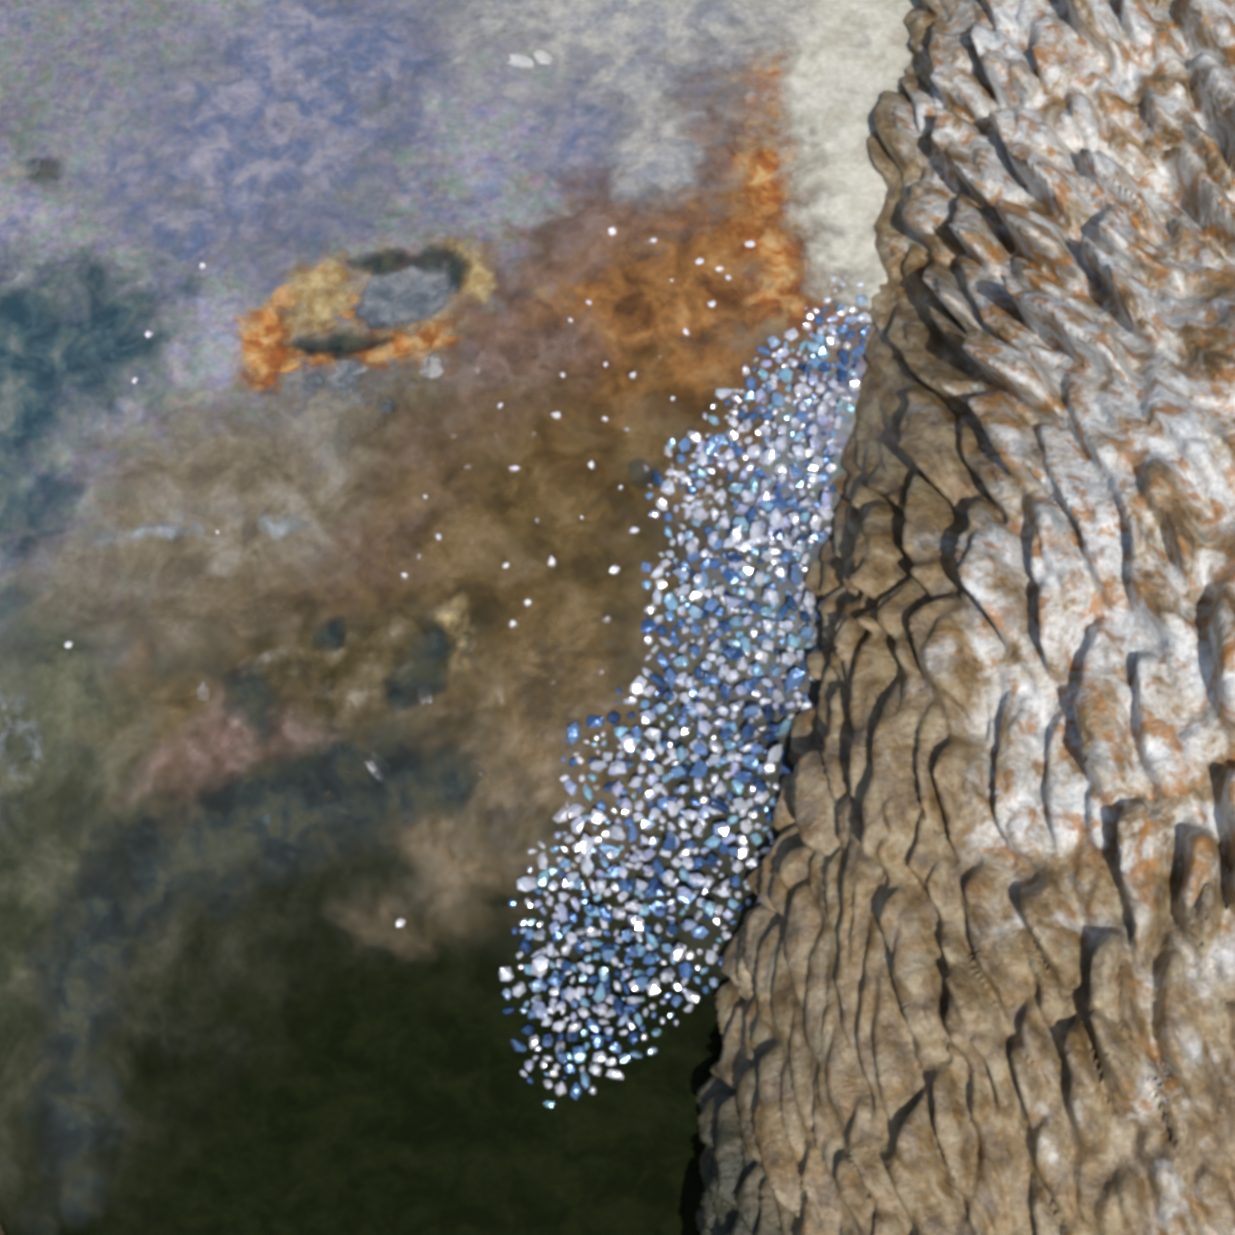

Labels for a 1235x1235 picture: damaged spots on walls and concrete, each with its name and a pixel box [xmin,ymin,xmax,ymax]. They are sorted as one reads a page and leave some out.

peeling [450,0,920,310]
leakage [0,254,167,551]
leakage [133,523,180,537]
spalling [238,239,494,406]
corrosion [319,50,857,799]